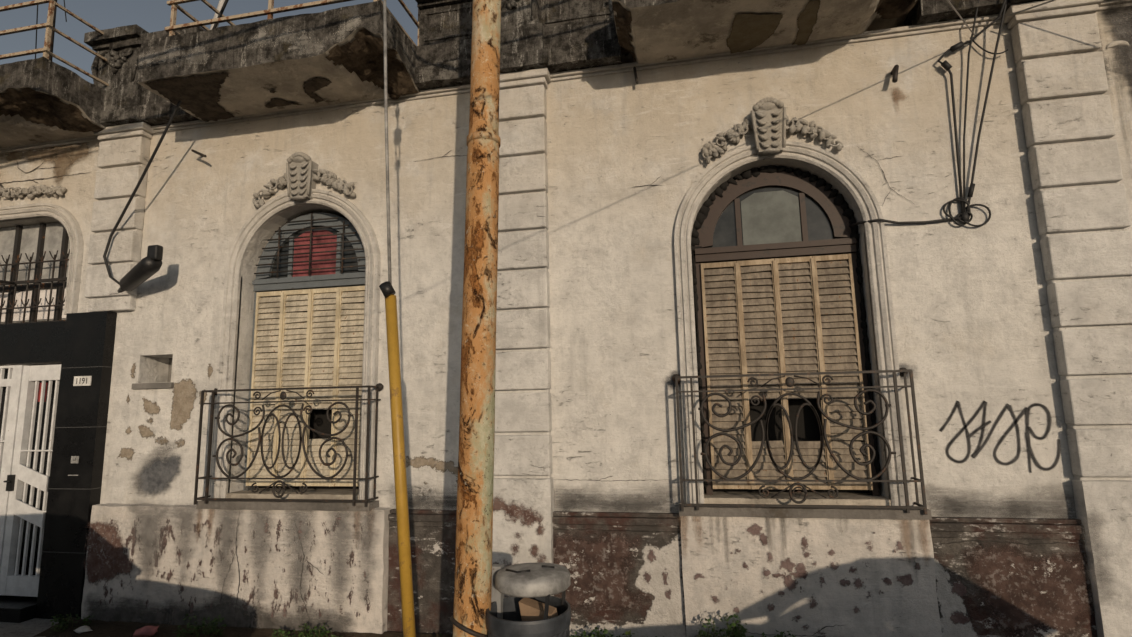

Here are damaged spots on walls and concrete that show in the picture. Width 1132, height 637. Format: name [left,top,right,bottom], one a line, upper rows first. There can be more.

spalling [0,88,104,132]
peeling [143,72,234,122]
peeling [266,77,332,108]
spalling [326,28,418,100]
water stain [1105,0,1132,85]
peeling [117,379,207,461]
water stain [136,448,181,494]
peeling [83,516,370,618]
water stain [332,512,373,589]
peeling [493,497,704,637]
peeling [730,523,920,636]
peeling [934,541,1094,637]